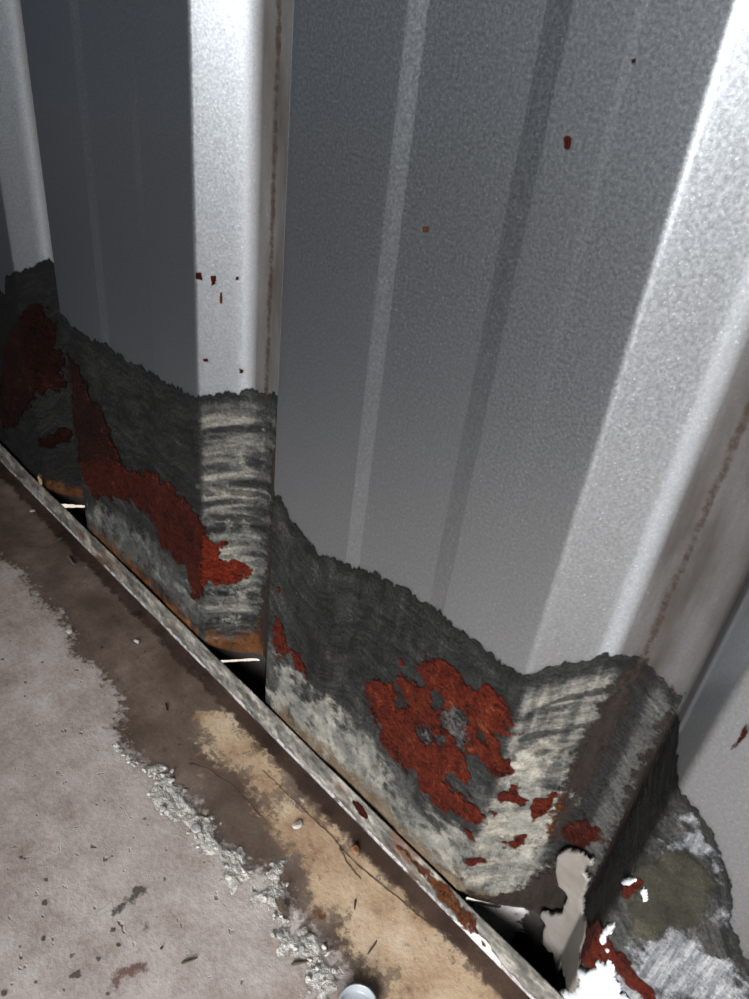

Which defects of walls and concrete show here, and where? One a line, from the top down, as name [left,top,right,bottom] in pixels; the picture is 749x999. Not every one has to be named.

rust [0,301,605,947]
leakage [0,258,749,999]
spalling [113,740,348,999]
rust [192,691,502,999]
rust [501,965,535,999]
peeling [540,847,632,999]
rust [619,877,644,900]
peeling [621,877,648,902]
rust [579,920,749,999]